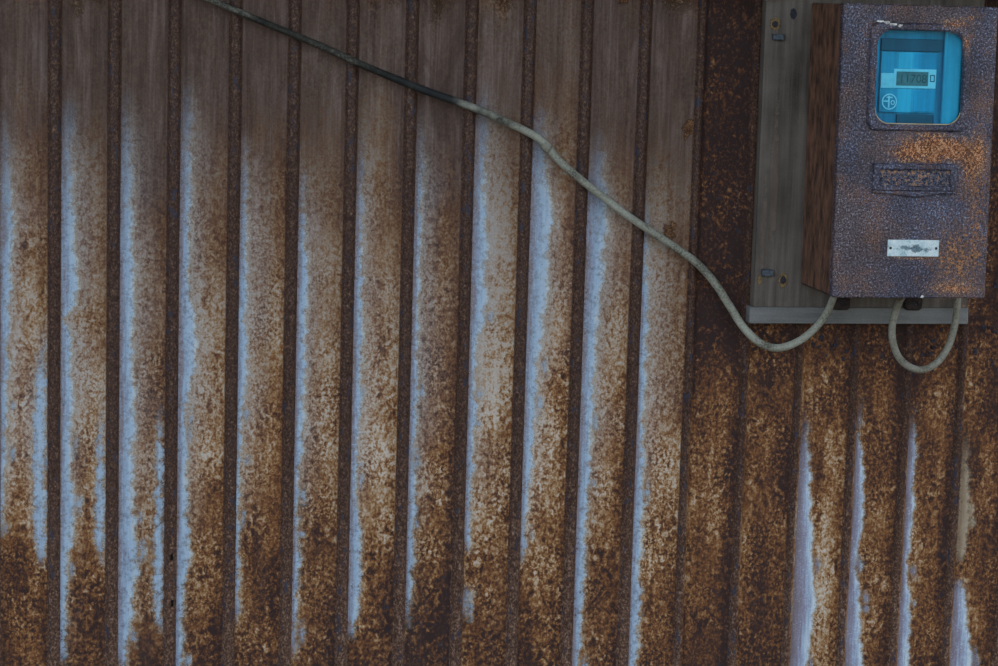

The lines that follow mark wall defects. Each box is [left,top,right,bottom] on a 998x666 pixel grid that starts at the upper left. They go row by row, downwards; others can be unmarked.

rust [663,221,677,240]
rust [882,101,998,300]